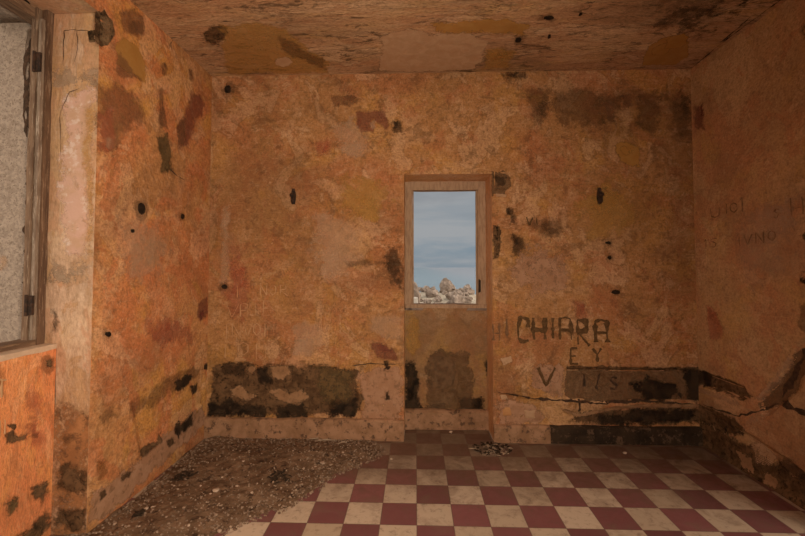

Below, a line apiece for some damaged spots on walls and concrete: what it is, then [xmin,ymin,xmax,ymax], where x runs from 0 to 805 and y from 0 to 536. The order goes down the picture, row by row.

damp [157,133,184,180]
damp [405,317,485,410]
spalling [494,364,753,405]
crack [703,348,805,417]